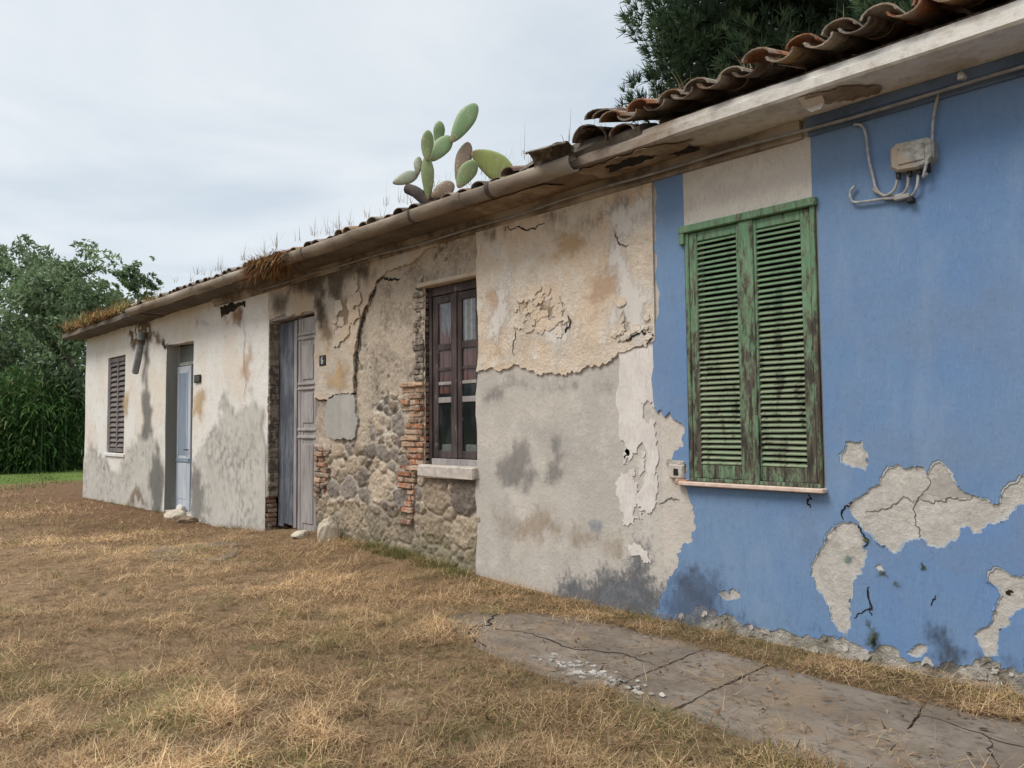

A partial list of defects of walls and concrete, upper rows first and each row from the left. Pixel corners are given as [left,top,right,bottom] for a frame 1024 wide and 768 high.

crack [504,223,544,231]
water stain [83,322,163,511]
water stain [190,393,266,531]
flaking render [268,244,440,400]
crack [316,277,400,401]
water stain [498,444,533,488]
peeling [476,77,1024,677]
water stain [558,533,717,627]
crack [855,587,873,618]